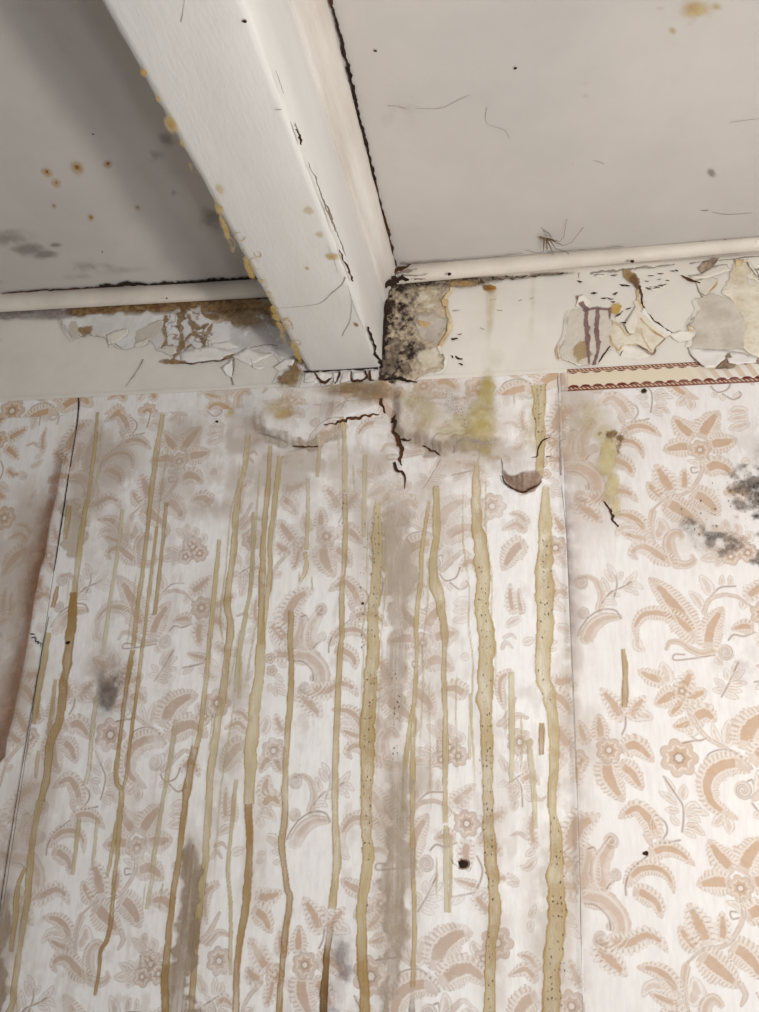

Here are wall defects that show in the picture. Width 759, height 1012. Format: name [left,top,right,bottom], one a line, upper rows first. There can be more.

damp [0,413,99,1012]
damp [89,414,168,995]
damp [145,436,283,1012]
peeling [58,283,463,388]
damp [276,612,294,1012]
spalling [308,162,353,282]
crack [259,398,491,489]
damp [320,455,452,1012]
damp [463,465,501,1012]
damp [509,384,568,1012]
peeling [555,258,759,369]
mould [727,465,759,518]